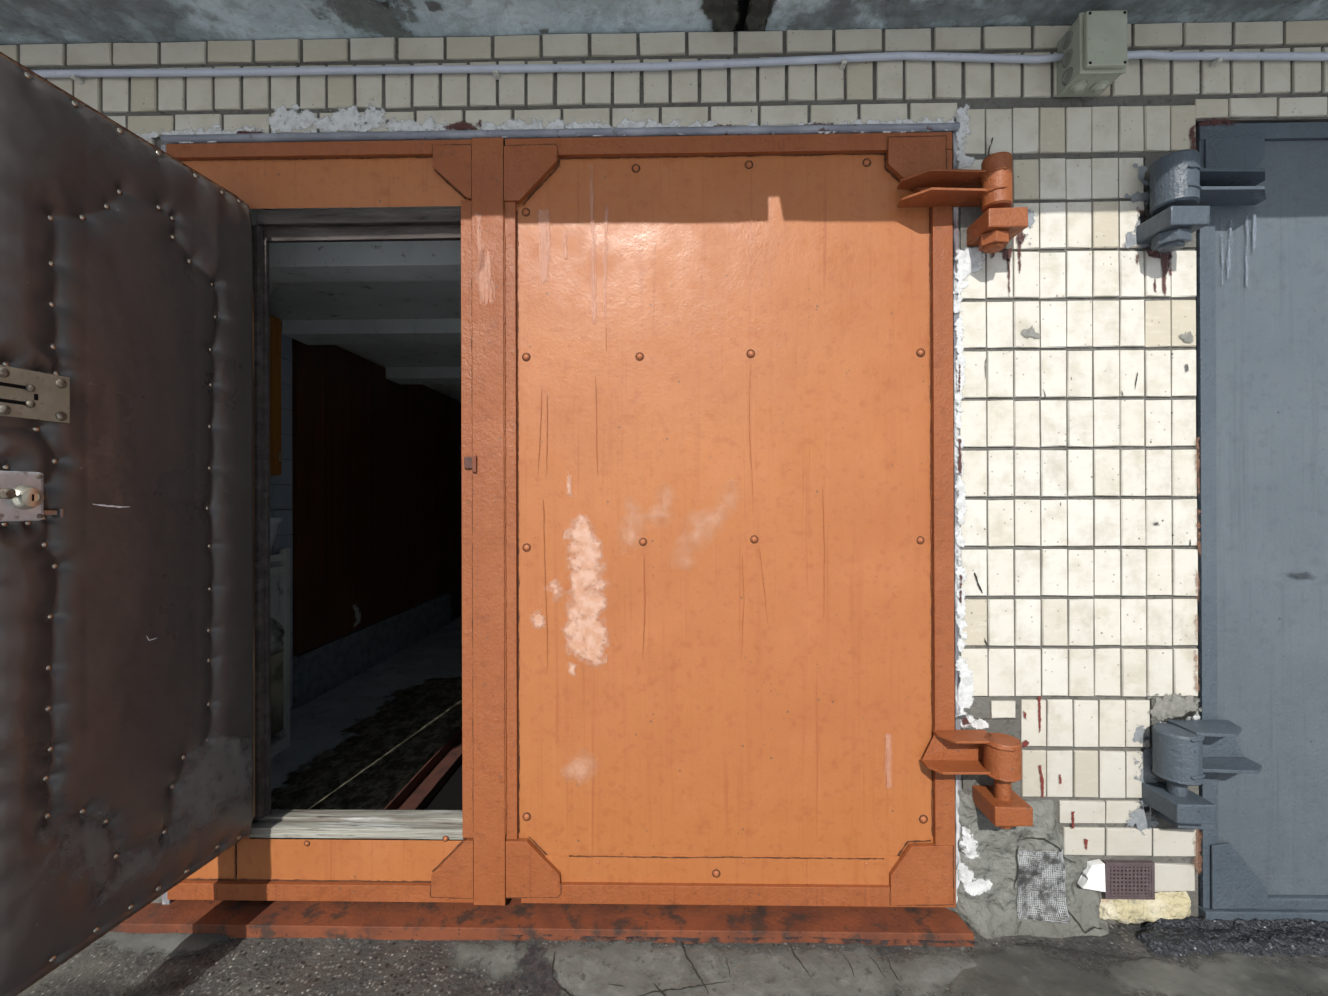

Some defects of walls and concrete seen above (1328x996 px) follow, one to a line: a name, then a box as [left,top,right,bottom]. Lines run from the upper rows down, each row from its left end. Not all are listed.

leakage [0,0,193,45]
leakage [311,0,443,39]
peeling [957,826,993,896]
spalling [1077,859,1191,924]